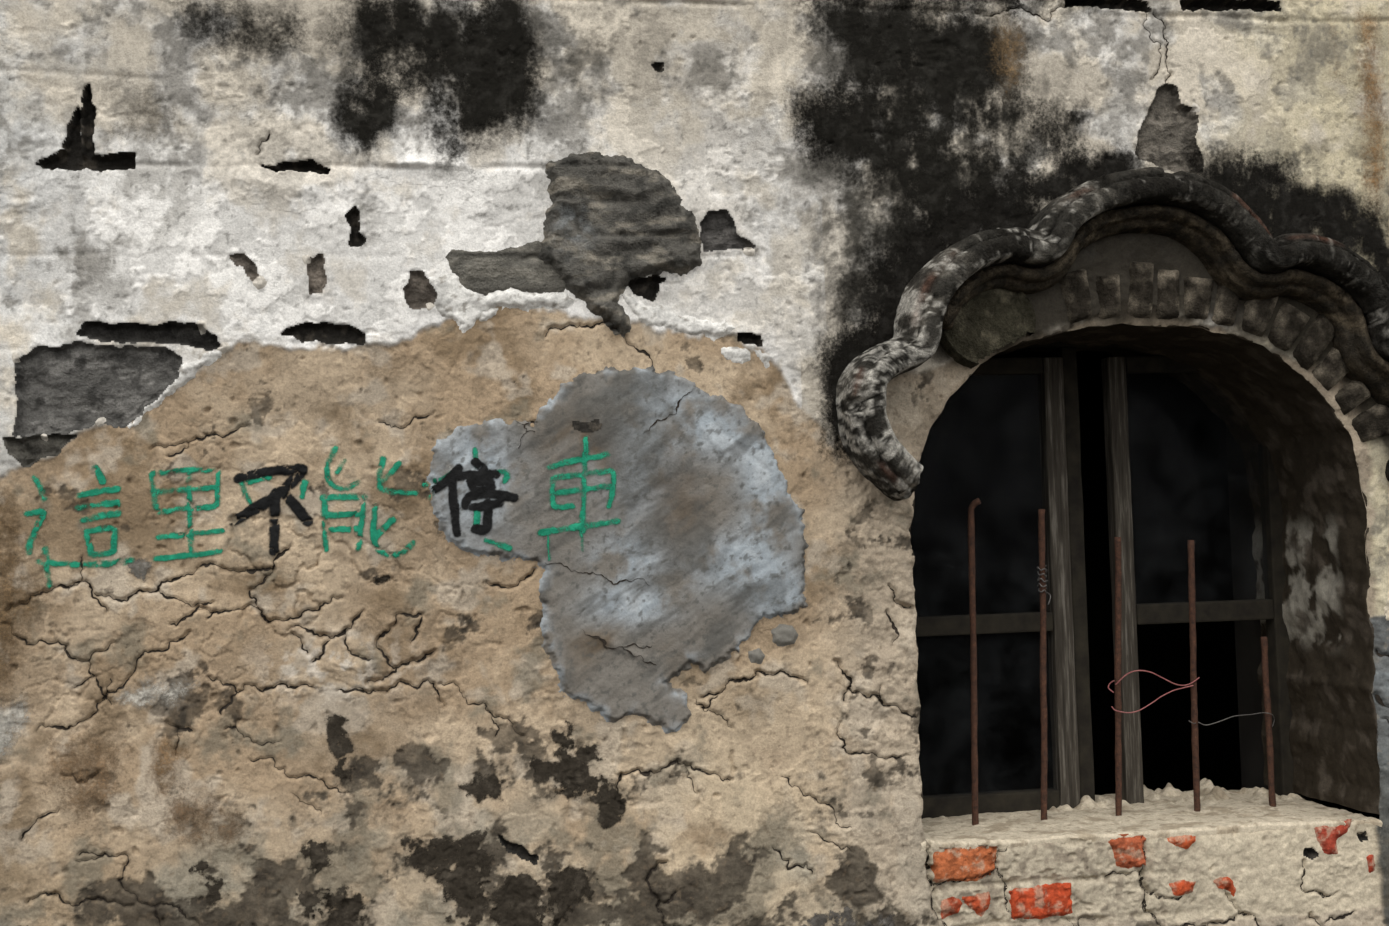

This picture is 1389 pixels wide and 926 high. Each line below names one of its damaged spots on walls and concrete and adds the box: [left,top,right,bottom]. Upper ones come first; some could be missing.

leakage [331,0,543,162]
spalling [1133,83,1204,175]
leakage [785,0,1142,457]
spalling [403,241,578,333]
spalling [2,320,230,467]
crack [7,547,523,812]
crack [696,670,808,727]
crack [837,665,917,760]
leakage [530,721,627,829]
leakage [401,828,598,926]
spalling [925,819,1387,926]
crack [1105,837,1259,926]